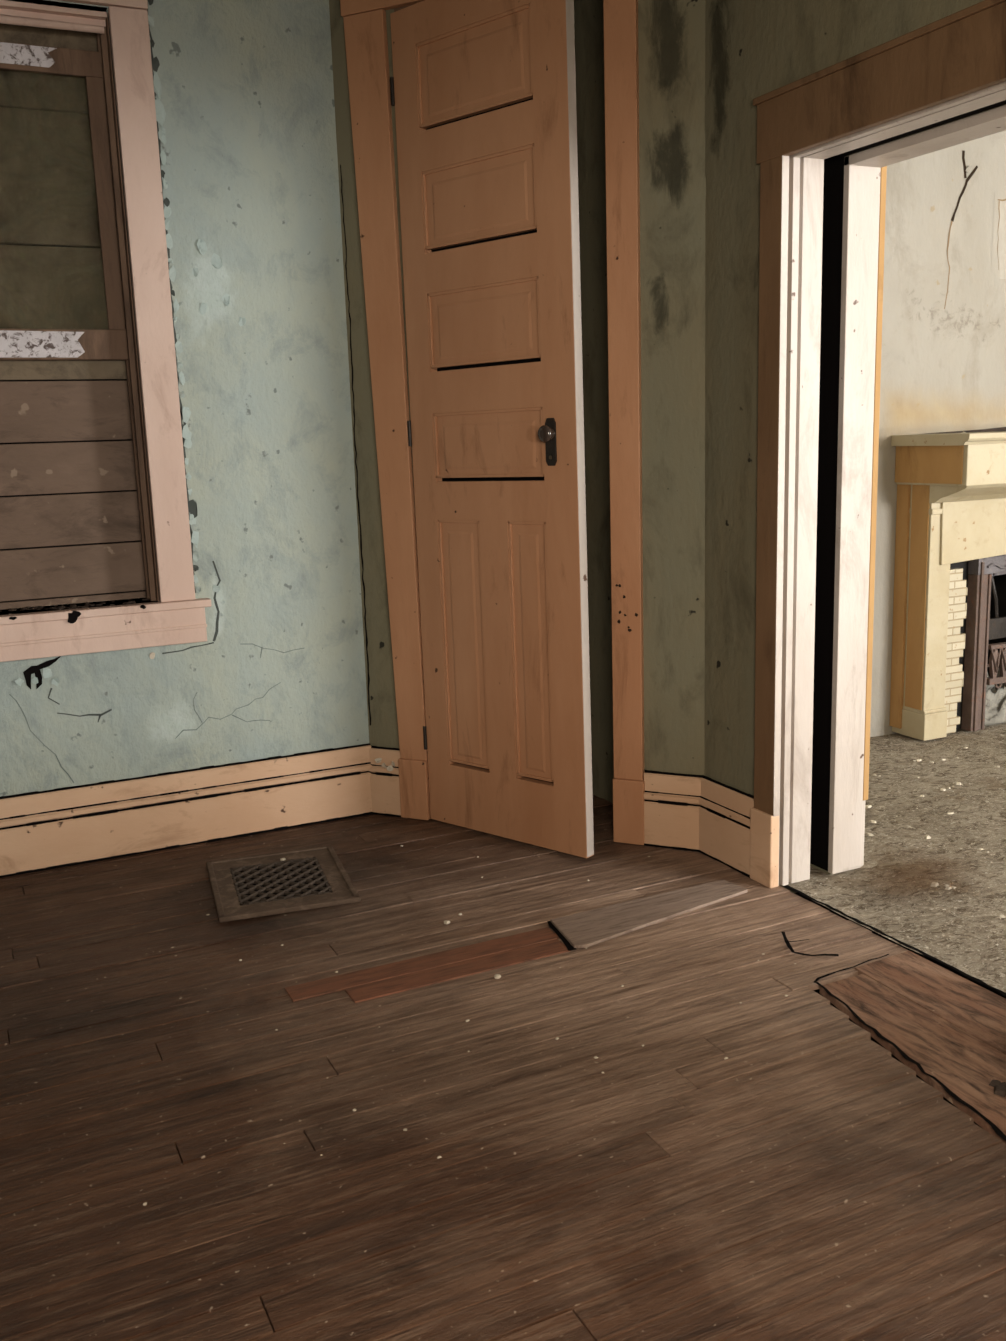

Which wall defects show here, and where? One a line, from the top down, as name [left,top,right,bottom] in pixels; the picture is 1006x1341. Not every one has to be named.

crack [944,150,978,309]
spalling [15,656,61,704]
crack [176,644,304,738]
crack [9,694,112,783]